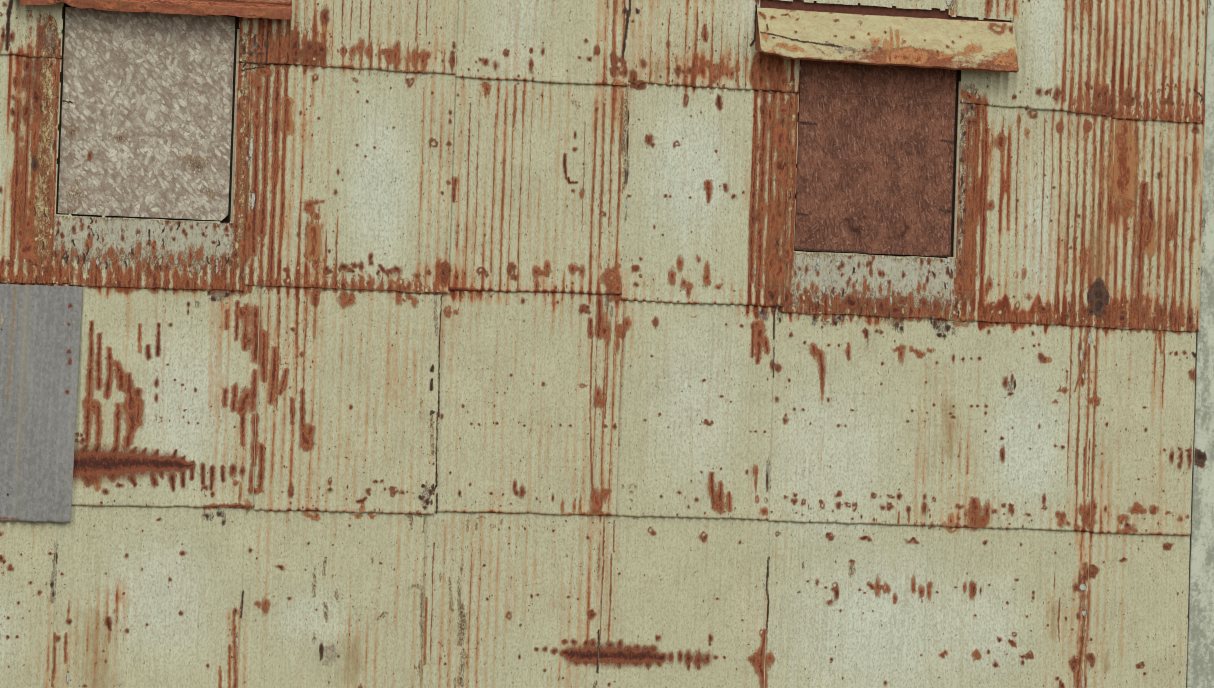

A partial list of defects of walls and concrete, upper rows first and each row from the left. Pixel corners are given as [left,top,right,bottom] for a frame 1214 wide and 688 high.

corrosion [0,0,544,527]
corrosion [405,0,1206,688]